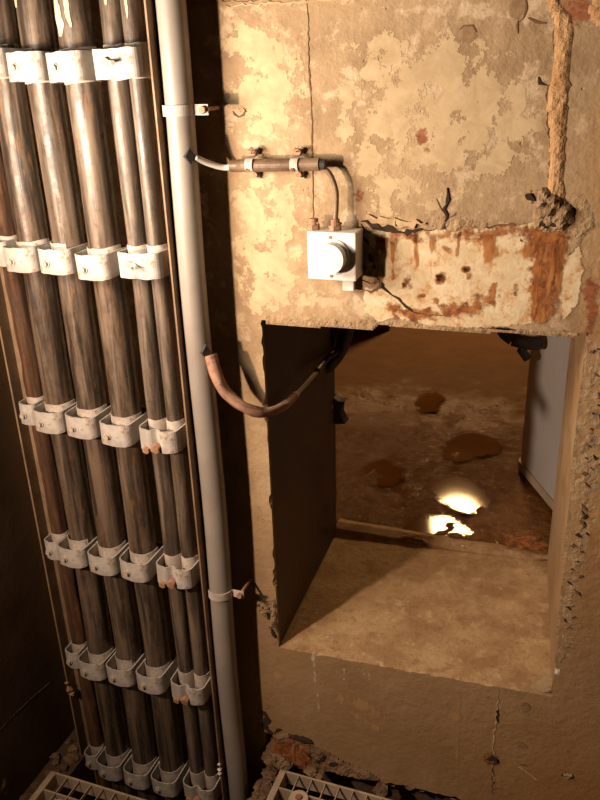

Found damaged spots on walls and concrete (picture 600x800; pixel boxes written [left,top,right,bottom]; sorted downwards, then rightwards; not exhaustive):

crack [221,0,357,217]
corrosion [375,226,570,324]
peeling [220,0,600,675]
spalling [272,732,392,798]
crack [491,693,499,794]